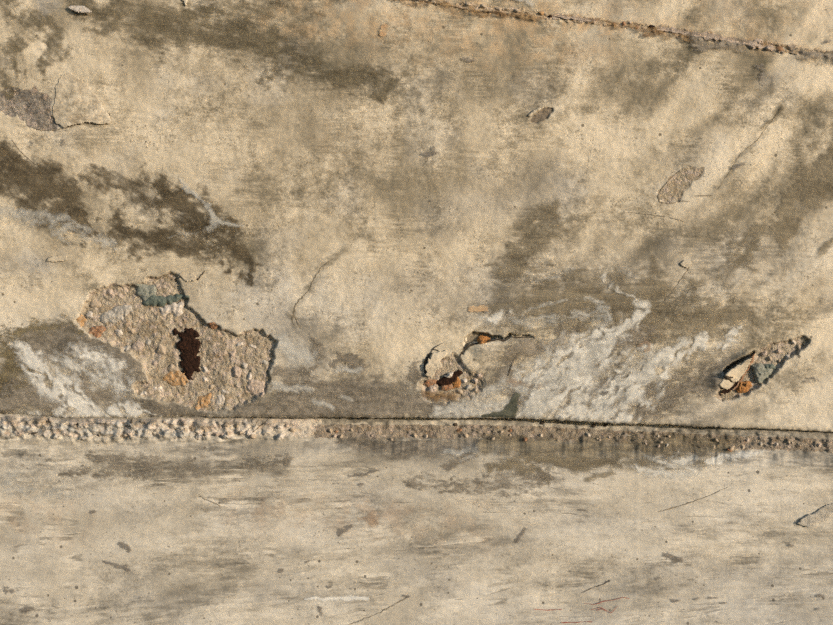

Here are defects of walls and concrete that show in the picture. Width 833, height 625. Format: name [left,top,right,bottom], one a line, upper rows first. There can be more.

damp [2,0,69,75]
damp [75,0,321,78]
crack [395,0,833,64]
spalling [0,86,61,132]
damp [329,66,398,104]
damp [0,141,261,286]
damp [233,142,833,423]
damp [0,316,215,418]
spalling [0,271,833,454]